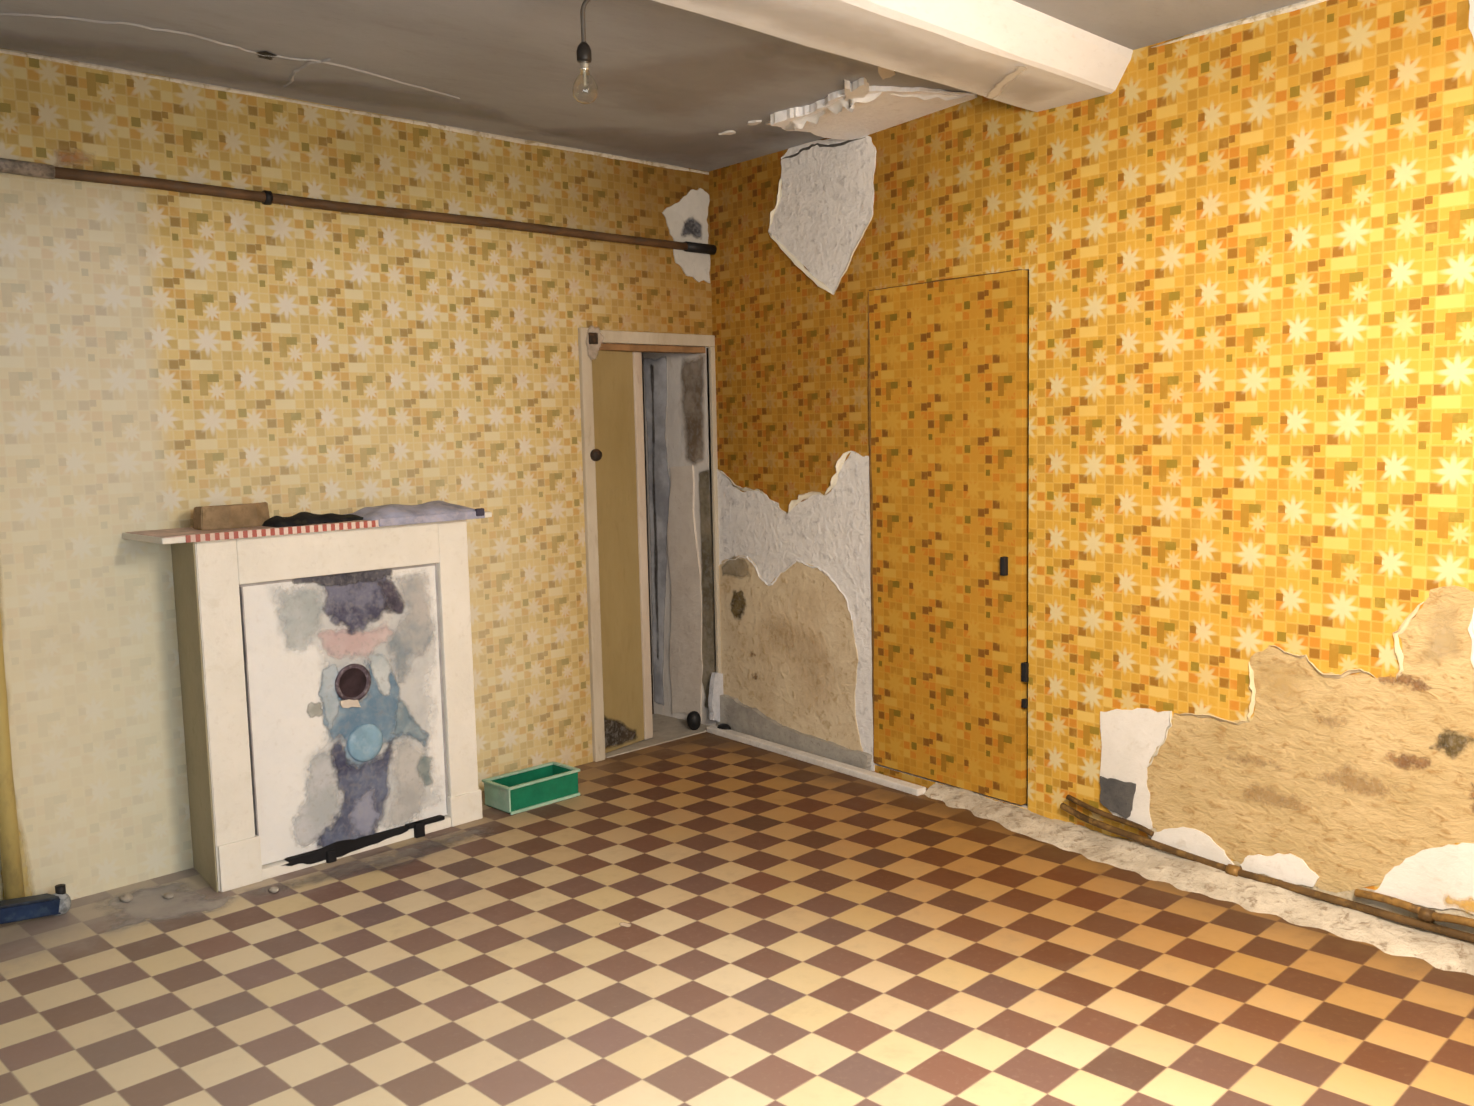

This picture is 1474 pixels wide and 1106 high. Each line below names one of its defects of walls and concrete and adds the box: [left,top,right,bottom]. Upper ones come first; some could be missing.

spalling [662,188,710,283]
peeling [719,66,1026,140]
spalling [644,357,863,752]
spalling [1147,585,1474,934]